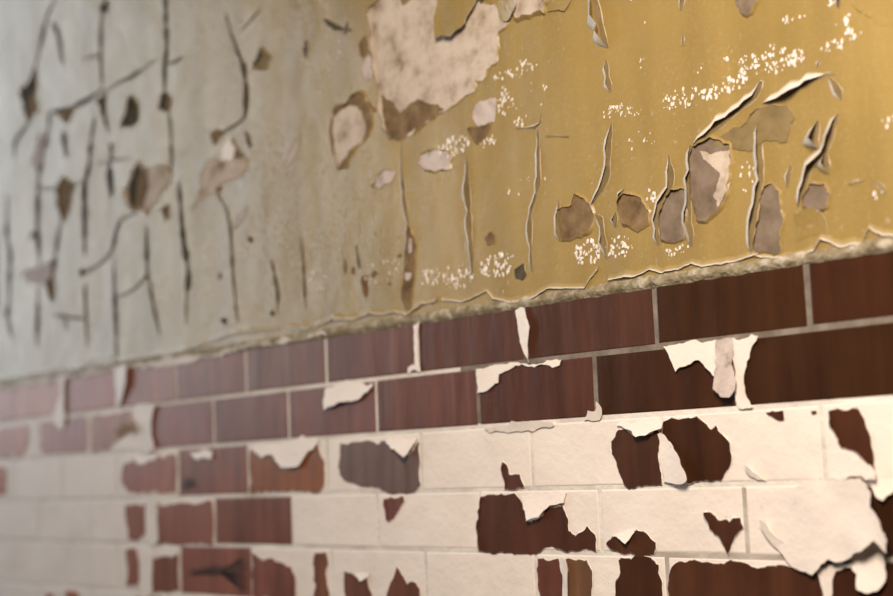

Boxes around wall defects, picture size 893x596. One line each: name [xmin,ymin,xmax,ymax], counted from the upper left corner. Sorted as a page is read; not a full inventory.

crack [223,9,262,148]
crack [323,19,352,35]
peeling [329,0,570,173]
crack [4,0,182,363]
crack [168,112,192,324]
crack [217,192,238,322]
crack [271,259,280,312]
peeling [0,331,326,596]
peeling [323,380,373,410]
peeling [338,437,421,522]
peeling [476,406,893,596]
peeling [663,334,758,409]